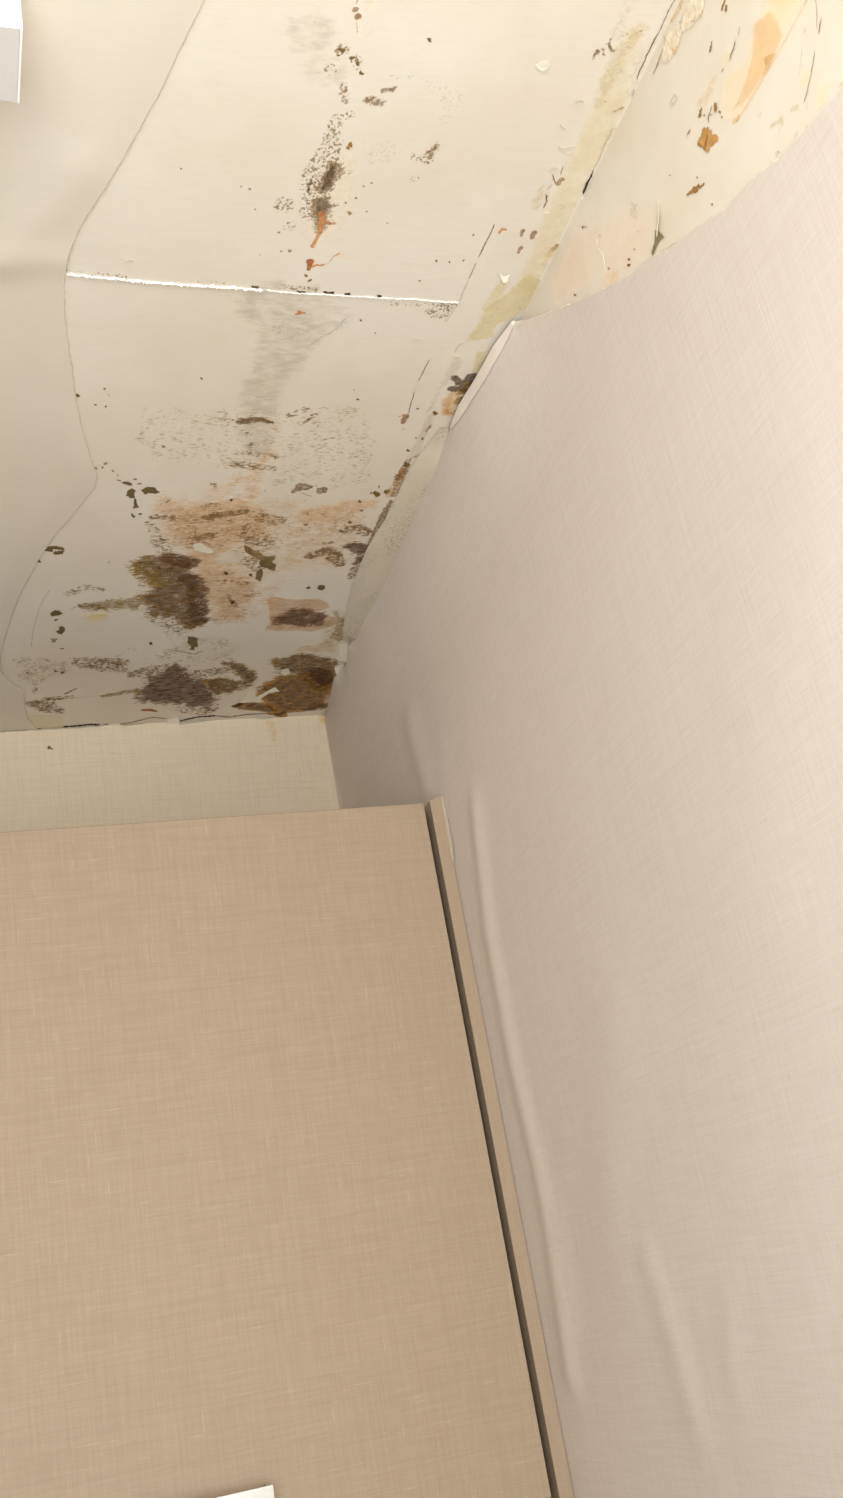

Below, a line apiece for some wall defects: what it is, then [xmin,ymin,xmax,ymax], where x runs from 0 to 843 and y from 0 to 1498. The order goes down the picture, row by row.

water stain [274,44,397,253]
peeling [697,127,718,152]
water stain [67,373,477,632]
water stain [26,653,339,717]